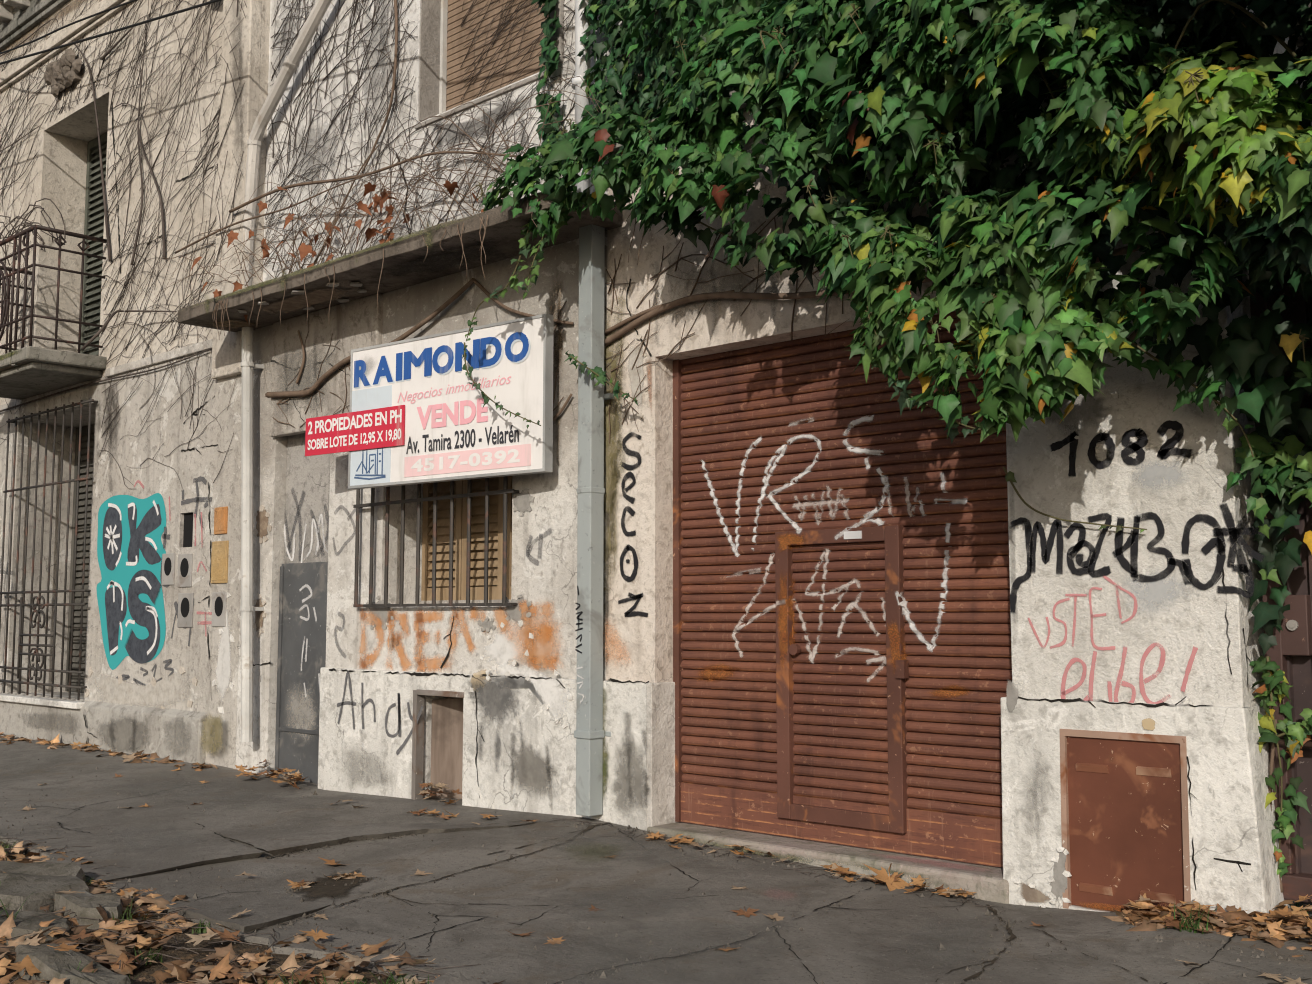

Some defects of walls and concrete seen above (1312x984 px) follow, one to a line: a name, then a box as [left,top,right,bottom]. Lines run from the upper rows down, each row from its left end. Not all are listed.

corrosion [779,578,796,655]
crack [1215,536,1250,690]
damp [470,681,554,791]
crack [1018,696,1211,708]
spalling [1013,846,1072,909]